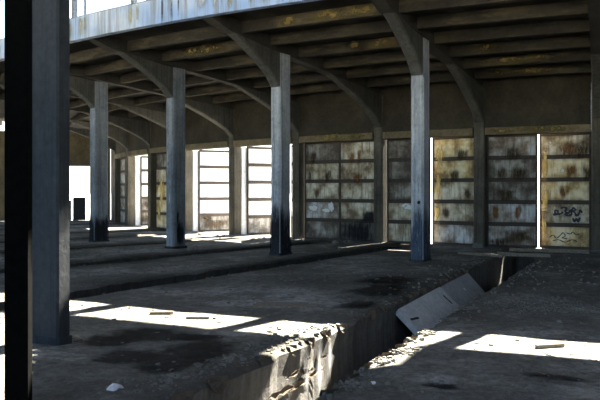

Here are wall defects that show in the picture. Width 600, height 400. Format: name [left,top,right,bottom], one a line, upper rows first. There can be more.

damp [89,215,109,240]
damp [270,205,291,253]
damp [309,202,334,212]
damp [342,211,374,241]
spalling [171,251,549,400]
damp [81,328,236,373]